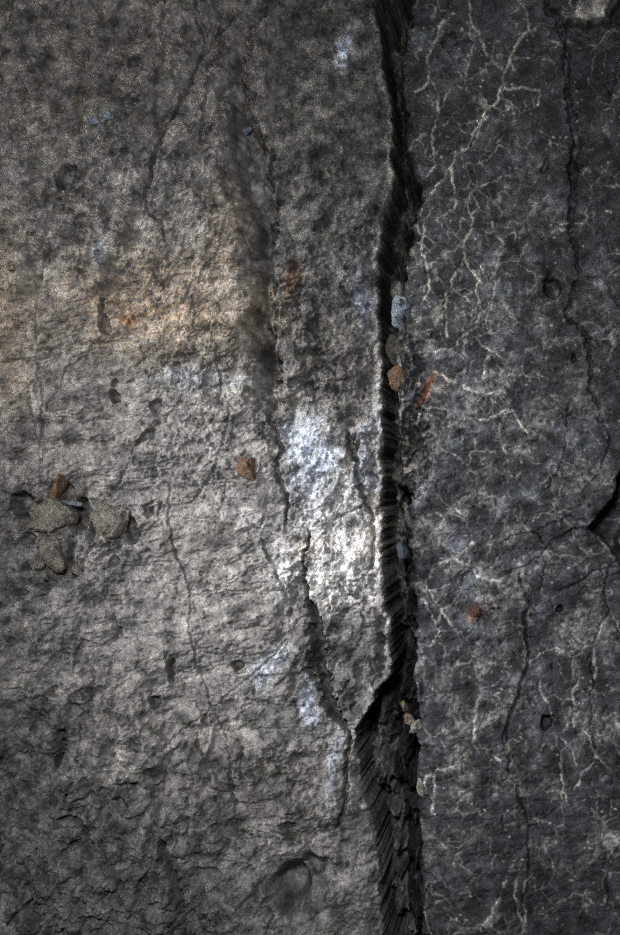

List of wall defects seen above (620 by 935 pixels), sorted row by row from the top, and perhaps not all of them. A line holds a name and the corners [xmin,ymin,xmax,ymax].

crack [109,326,366,935]
crack [407,0,620,935]